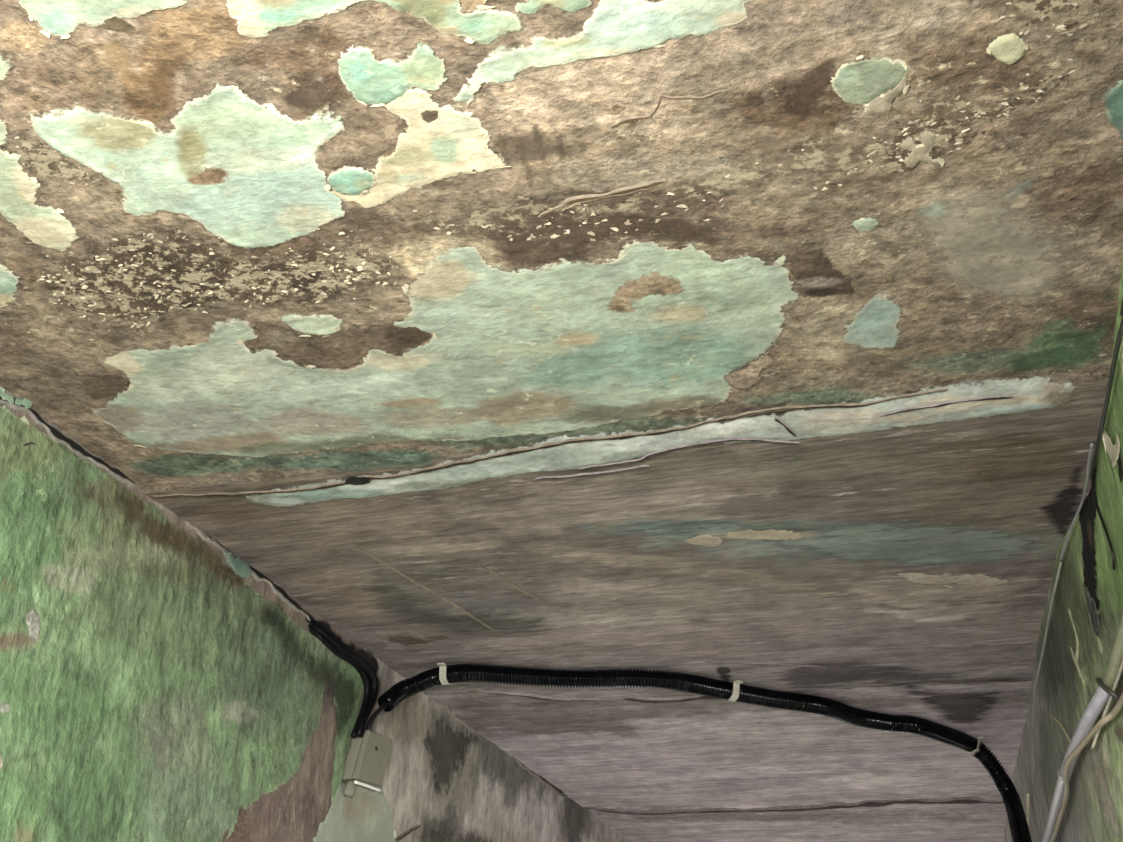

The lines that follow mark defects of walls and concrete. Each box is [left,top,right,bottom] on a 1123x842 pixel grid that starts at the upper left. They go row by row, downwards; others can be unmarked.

flaking render [986,0,1099,64]
water stain [284,86,329,111]
water stain [786,60,833,113]
water stain [502,135,568,161]
peeling [0,0,1076,457]
water stain [494,213,702,252]
water stain [1012,319,1108,371]
crack [0,388,1014,644]
peeling [671,522,1033,588]
spalling [1079,468,1102,638]
peeling [0,387,397,842]
crack [503,750,1004,815]